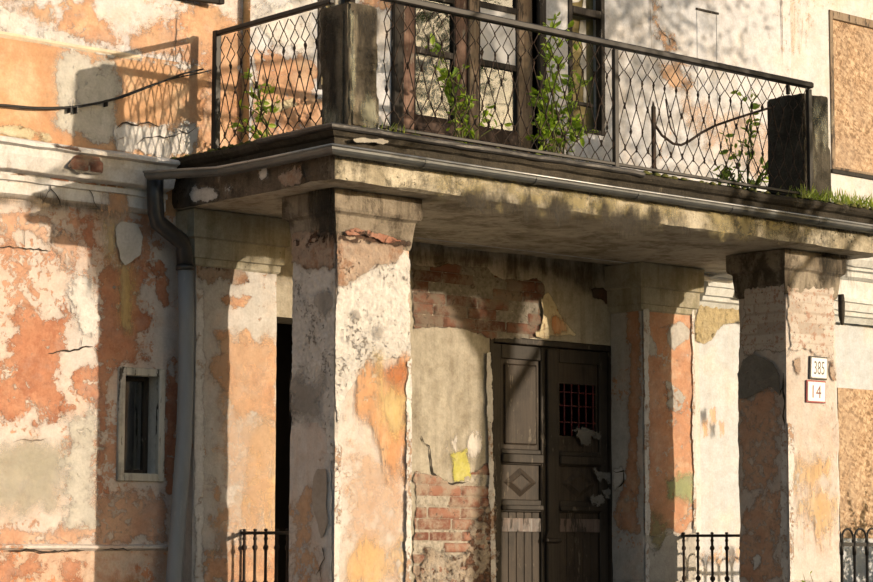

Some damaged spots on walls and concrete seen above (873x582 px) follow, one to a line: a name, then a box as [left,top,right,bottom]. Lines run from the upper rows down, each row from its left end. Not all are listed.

peeling [0,0,322,159]
water stain [321,15,336,112]
water stain [359,6,379,90]
peeling [651,0,768,175]
crack [49,341,98,354]
peeling [0,207,178,582]
peeling [194,266,276,582]
flaking render [289,228,576,582]
water stain [463,189,578,224]
water stain [592,201,663,236]
peeling [613,283,837,582]
water stain [820,252,850,285]